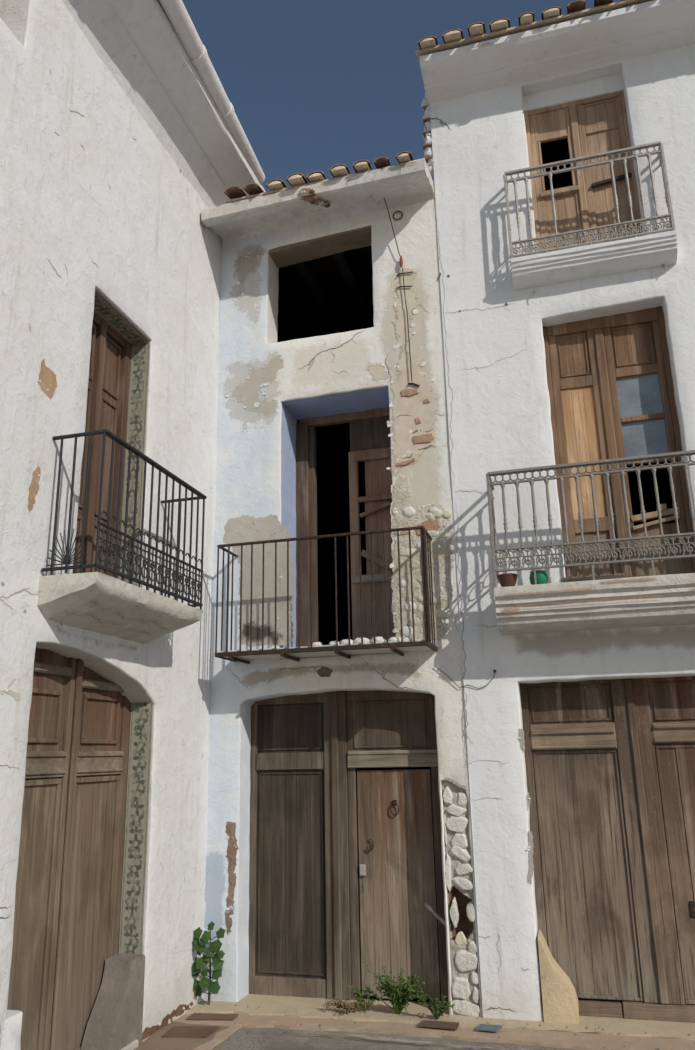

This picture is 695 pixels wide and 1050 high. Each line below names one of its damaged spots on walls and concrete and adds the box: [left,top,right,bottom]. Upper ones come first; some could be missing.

peeling [36,358,58,400]
peeling [225,355,284,416]
crack [296,331,363,374]
peeling [367,268,445,476]
peeling [27,465,41,514]
crack [415,185,523,801]
crack [0,588,38,605]
spalling [440,780,481,1017]